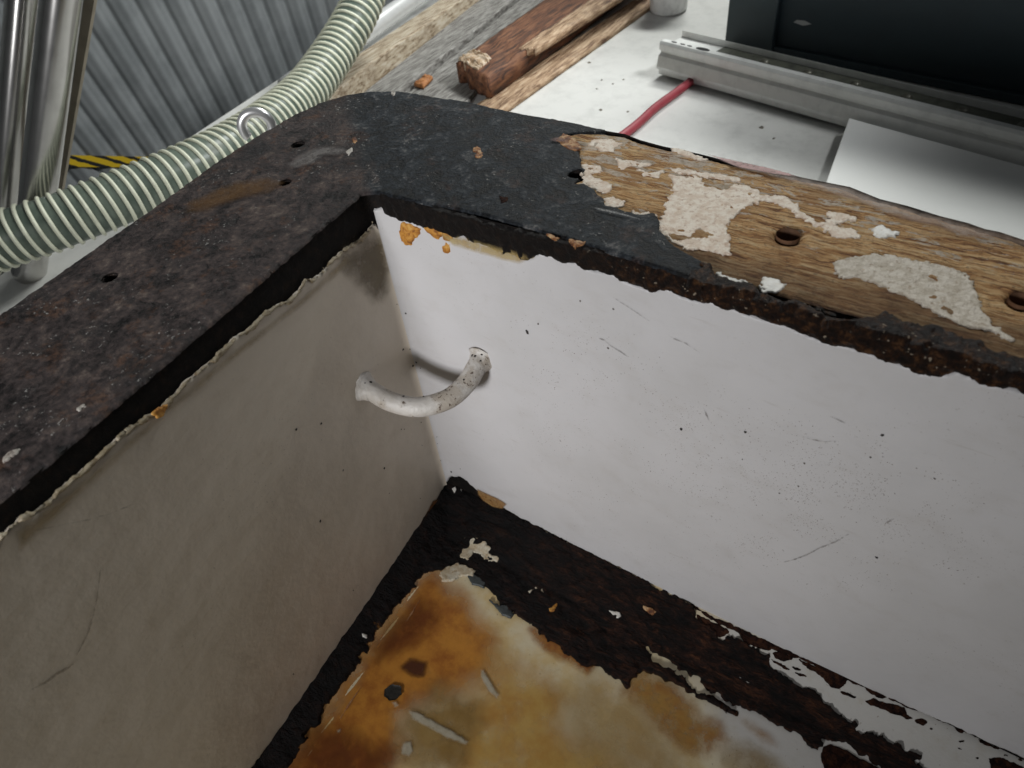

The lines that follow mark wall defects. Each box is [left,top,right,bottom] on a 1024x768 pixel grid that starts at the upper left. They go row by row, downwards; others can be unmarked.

rust [552,133,582,151]
peeling [580,138,900,256]
rust [399,222,453,253]
rust [546,233,586,250]
peeling [715,272,787,294]
peeling [833,253,1016,342]
rust [151,404,168,419]
rust [251,484,923,768]
peeling [691,604,1023,768]